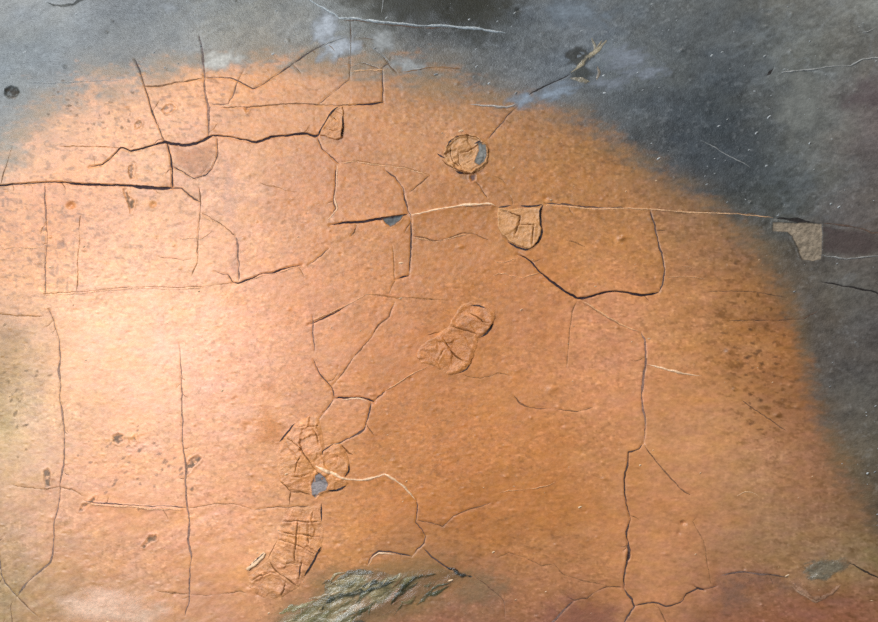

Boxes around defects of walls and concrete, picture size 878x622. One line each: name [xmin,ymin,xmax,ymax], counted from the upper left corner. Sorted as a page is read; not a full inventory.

crack [767,57,878,75]
crack [489,74,570,138]
peeling [497,204,543,251]
peeling [773,222,823,261]
crack [0,0,513,622]
crack [499,203,878,622]
peeling [246,416,353,600]